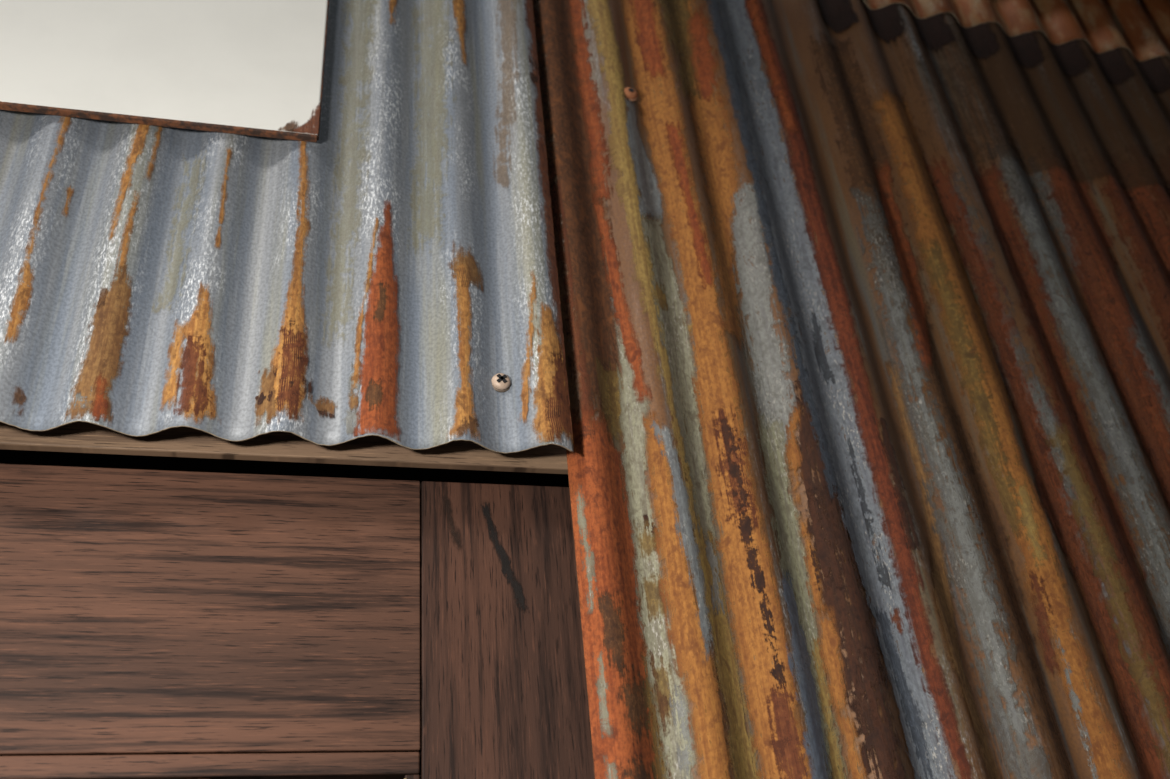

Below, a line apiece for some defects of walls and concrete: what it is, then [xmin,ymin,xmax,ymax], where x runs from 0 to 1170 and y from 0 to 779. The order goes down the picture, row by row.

corrosion [13,387,27,415]
corrosion [4,116,71,342]
corrosion [65,124,163,422]
corrosion [162,283,216,424]
corrosion [215,149,232,248]
corrosion [255,104,320,426]
corrosion [351,201,401,441]
corrosion [449,241,483,439]
corrosion [520,0,732,779]
corrosion [621,0,813,779]
corrosion [745,0,1001,779]
corrosion [811,31,1170,779]